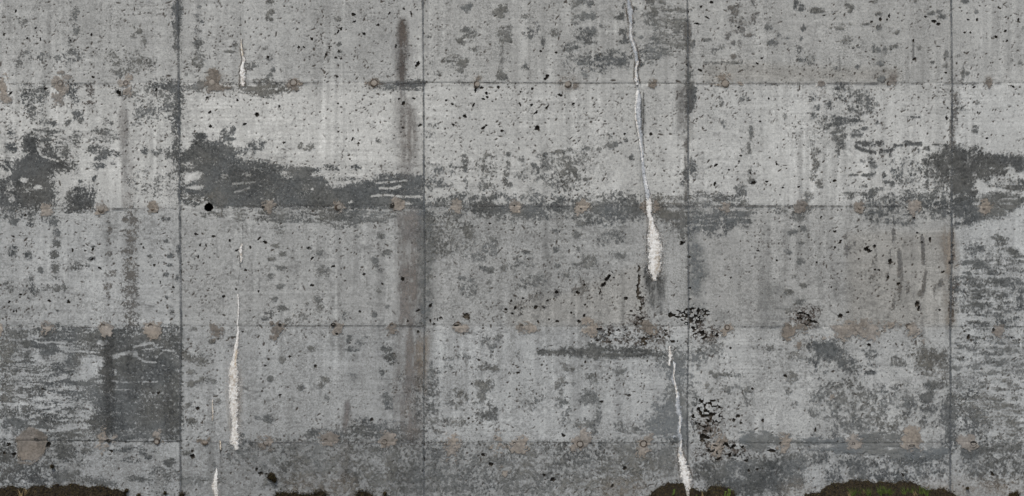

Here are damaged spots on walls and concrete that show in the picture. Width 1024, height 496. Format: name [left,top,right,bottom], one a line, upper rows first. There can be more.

damp [104,0,399,325]
crack [624,0,667,281]
damp [0,335,17,402]
damp [103,335,115,401]
crack [209,224,244,496]
peeling [226,306,1024,496]
peeling [536,265,723,360]
crack [666,322,695,496]